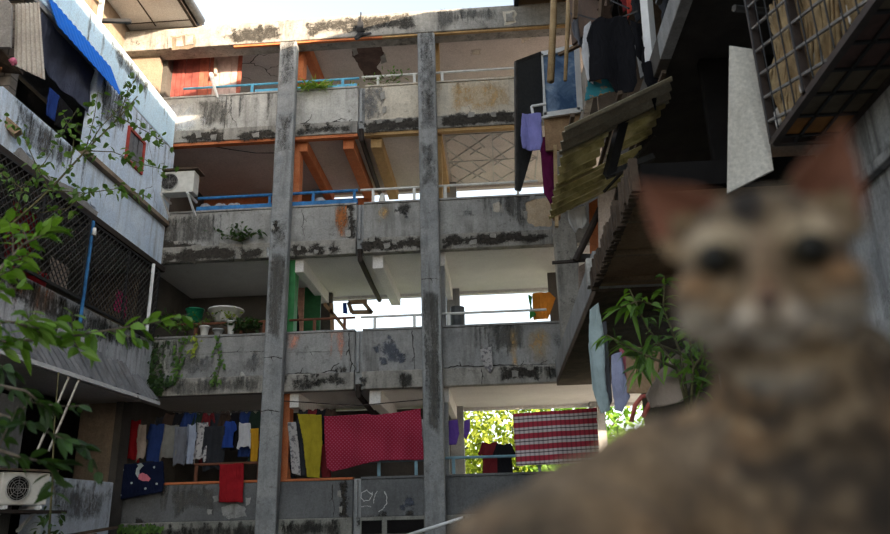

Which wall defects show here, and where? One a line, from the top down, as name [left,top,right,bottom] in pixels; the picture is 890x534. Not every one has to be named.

damp [306,13,416,36]
damp [439,9,495,28]
damp [362,87,384,118]
peeling [352,47,419,134]
damp [297,123,350,135]
rust [335,206,348,235]
damp [475,325,523,363]
damp [282,520,338,534]